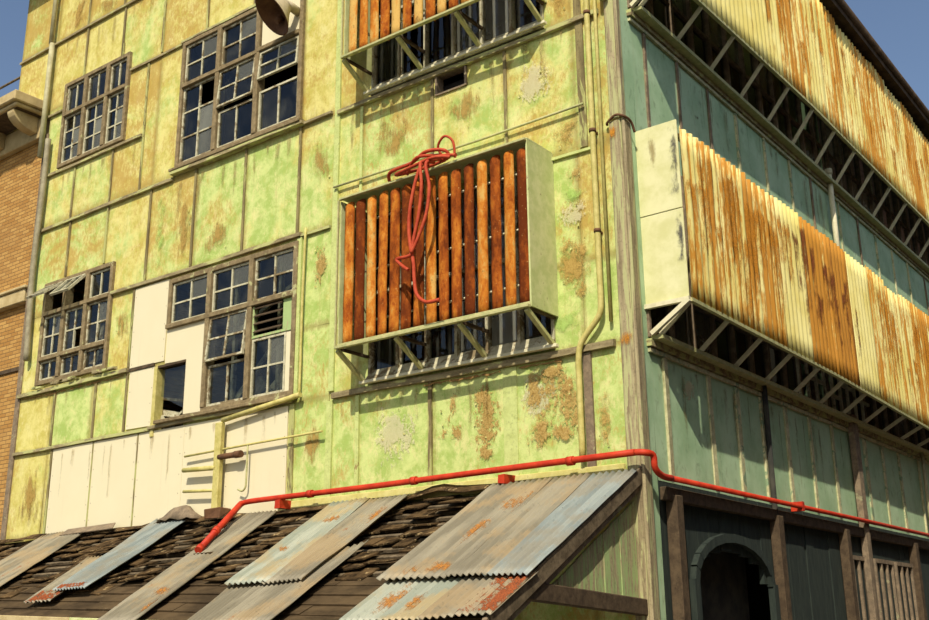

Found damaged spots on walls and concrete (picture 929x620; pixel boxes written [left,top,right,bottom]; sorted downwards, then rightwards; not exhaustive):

rust [765,0,806,69]
peeling [518,64,551,103]
rust [882,109,929,188]
peeling [557,199,585,226]
peeling [558,237,591,296]
rust [686,160,861,346]
rust [876,291,929,391]
peeling [376,407,416,466]
peeling [473,383,501,459]
peeling [522,362,578,452]
rust [25,582,85,602]
rust [455,572,532,613]